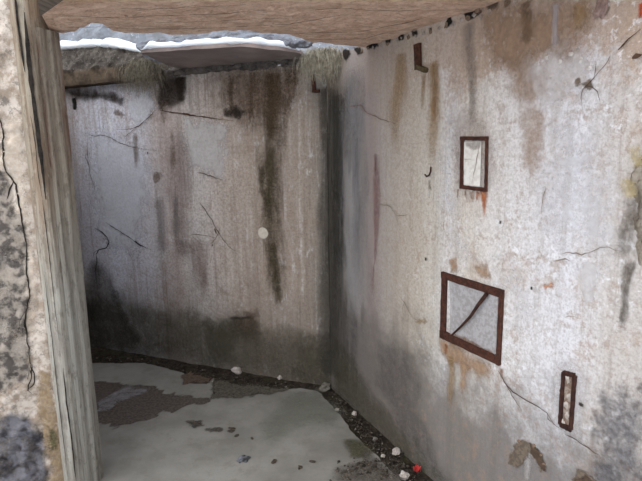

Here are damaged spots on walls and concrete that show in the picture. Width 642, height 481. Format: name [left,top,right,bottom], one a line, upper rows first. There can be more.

water stain [70,77,185,124]
water stain [225,71,295,118]
corrosion [422,64,438,122]
crack [581,29,642,112]
crack [85,110,232,190]
corrosion [457,191,487,212]
crack [0,0,76,478]
water stain [321,90,345,374]
crack [555,247,622,261]
corrosion [440,340,487,388]
crack [498,371,601,457]
spalling [508,440,546,472]